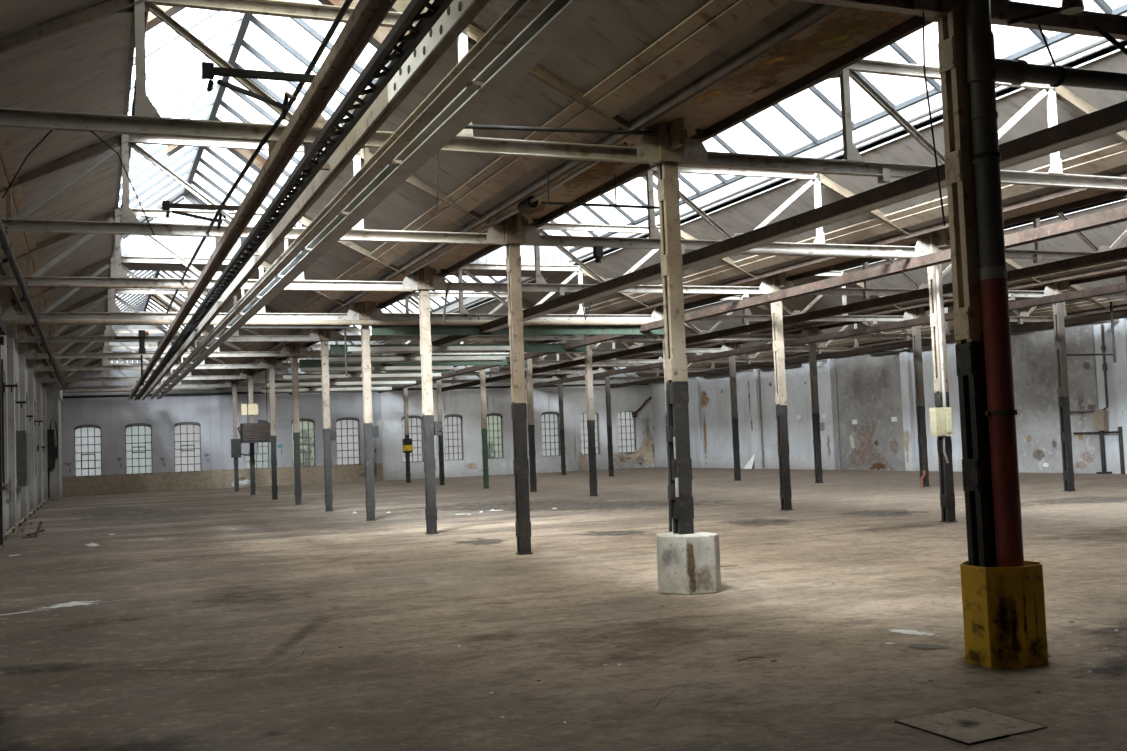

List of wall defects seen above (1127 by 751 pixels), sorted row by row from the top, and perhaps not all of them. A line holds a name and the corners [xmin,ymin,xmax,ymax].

peeling [613,432,655,468]
peeling [847,421,898,470]